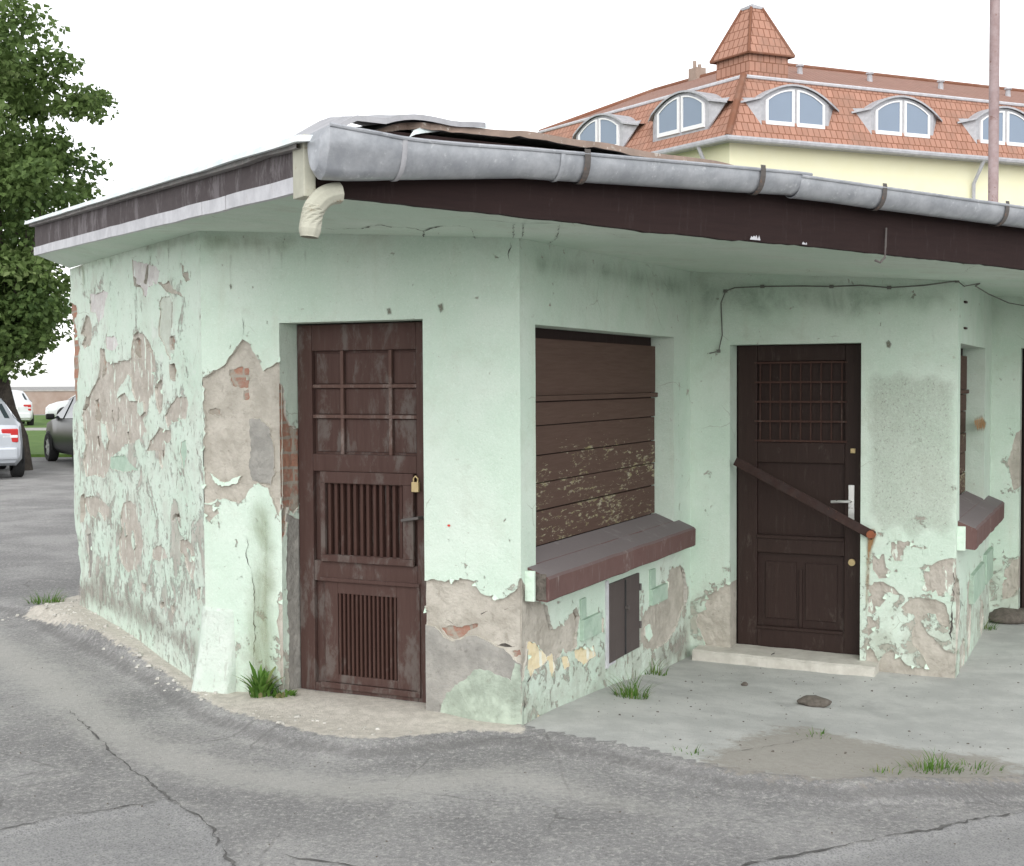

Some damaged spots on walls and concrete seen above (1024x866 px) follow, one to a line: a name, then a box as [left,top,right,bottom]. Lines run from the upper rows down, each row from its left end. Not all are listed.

flaking render [68,261,188,478]
flaking render [1008,429,1022,490]
peeling [120,501,167,572]
flaking render [201,340,301,690]
flaking render [423,575,595,726]
flaking render [641,565,684,651]
flaking render [697,580,736,647]
flaking render [866,540,972,678]
flaking render [1002,557,1020,599]